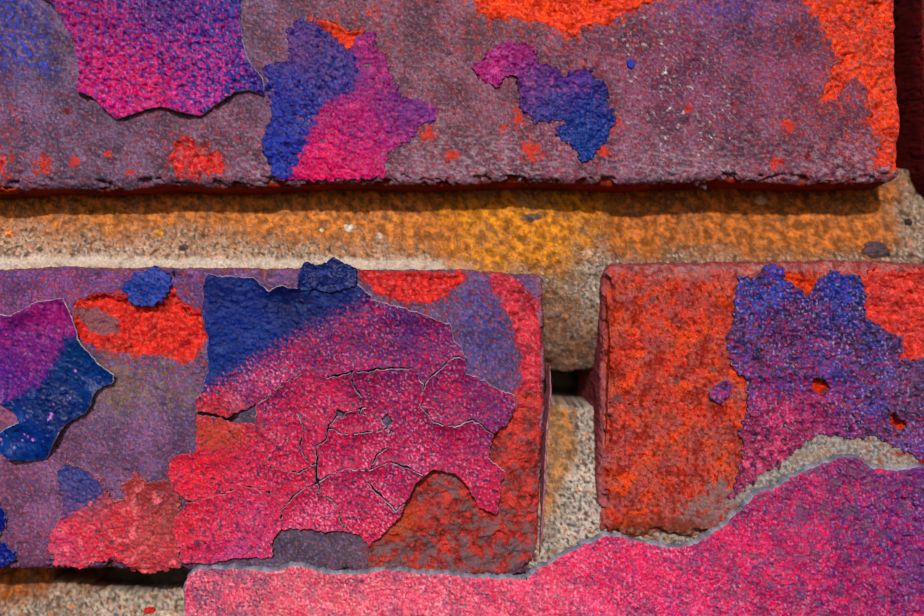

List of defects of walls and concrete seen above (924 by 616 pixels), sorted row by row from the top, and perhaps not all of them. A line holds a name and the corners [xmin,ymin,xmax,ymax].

peeling [48,0,439,184]
peeling [472,40,617,163]
crack [198,412,238,421]
crack [316,367,394,490]
peeling [0,257,924,616]